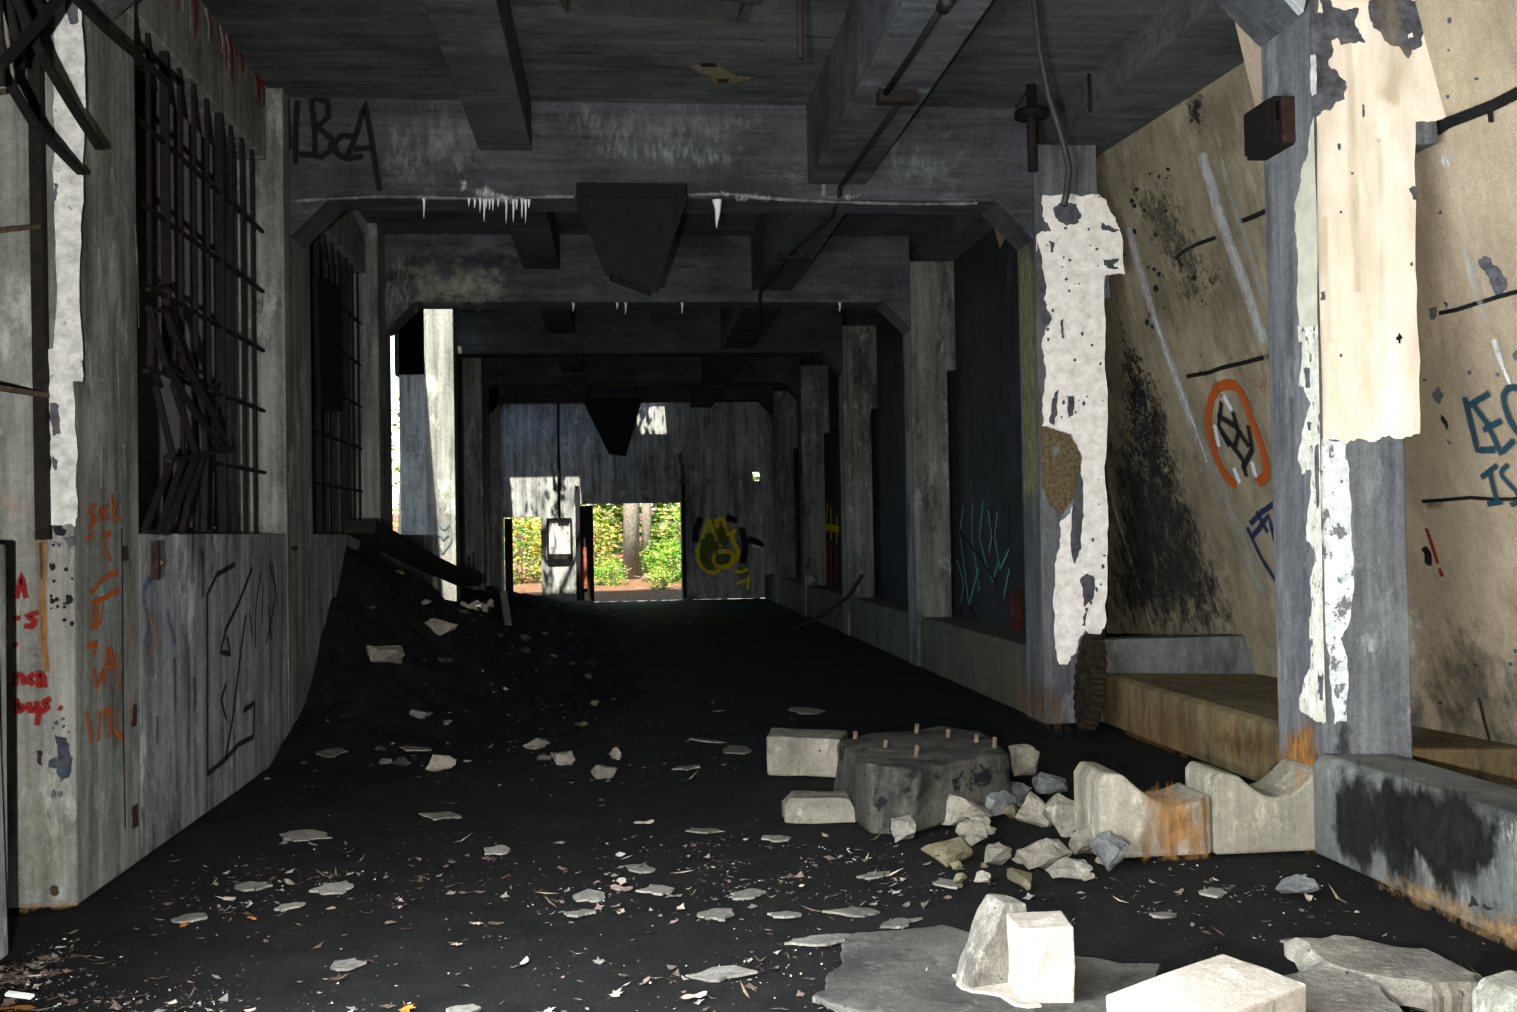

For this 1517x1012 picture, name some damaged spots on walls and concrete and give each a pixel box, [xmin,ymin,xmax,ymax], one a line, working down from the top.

leakage [1187,95,1205,133]
peeling [1311,0,1423,118]
peeling [1036,202,1120,346]
peeling [1428,302,1448,320]
peeling [1478,256,1508,295]
spalling [1041,389,1106,626]
leakage [1108,295,1229,634]
leakage [1124,153,1267,593]
peeling [1422,379,1451,445]